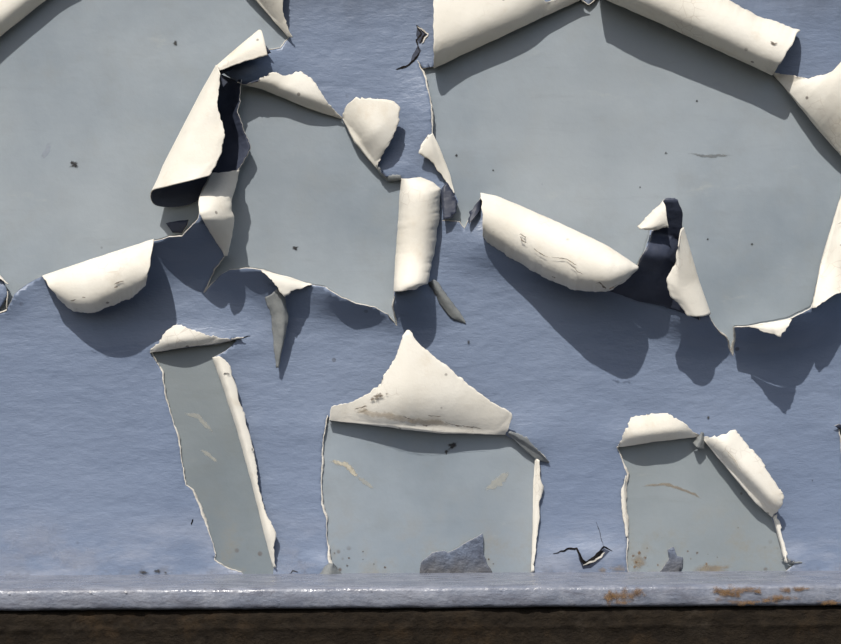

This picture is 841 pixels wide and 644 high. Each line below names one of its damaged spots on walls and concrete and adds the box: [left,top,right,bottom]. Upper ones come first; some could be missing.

peeling [0,0,841,368]
peeling [150,325,276,574]
rust [0,587,841,644]
peeling [320,330,549,574]
crack [553,522,612,569]
peeling [617,413,802,572]